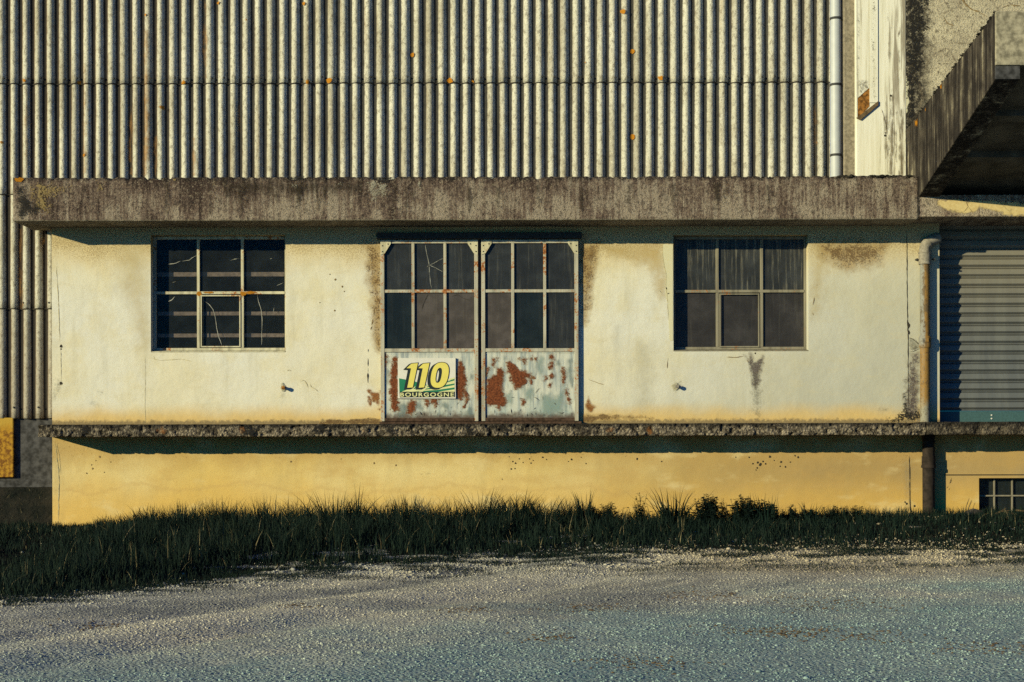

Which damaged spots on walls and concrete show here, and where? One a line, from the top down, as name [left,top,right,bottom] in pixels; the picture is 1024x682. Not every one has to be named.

leakage [883,0,931,175]
leakage [14,186,42,219]
rust [362,242,439,415]
rust [456,357,470,408]
rust [485,355,571,409]
leakage [749,354,763,388]
leakage [889,354,920,423]